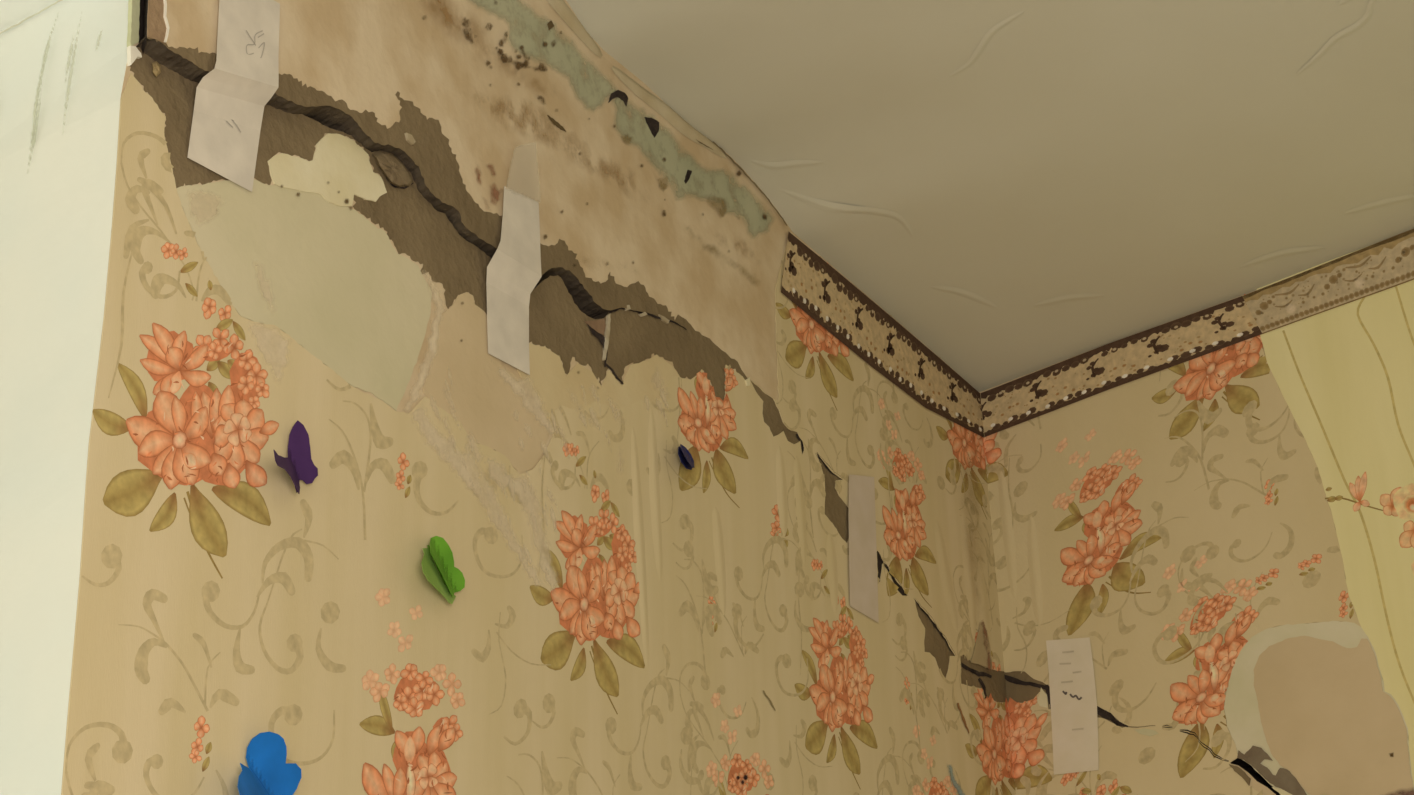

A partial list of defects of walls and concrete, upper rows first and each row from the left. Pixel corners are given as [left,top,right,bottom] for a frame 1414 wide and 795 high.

crack [136,0,209,83]
damp [437,0,473,43]
damp [487,24,547,85]
crack [266,93,497,259]
crack [696,139,787,226]
peeling [130,0,771,587]
crack [535,267,687,384]
crack [877,551,1051,709]
crack [1097,706,1292,795]
peeling [1224,621,1414,795]